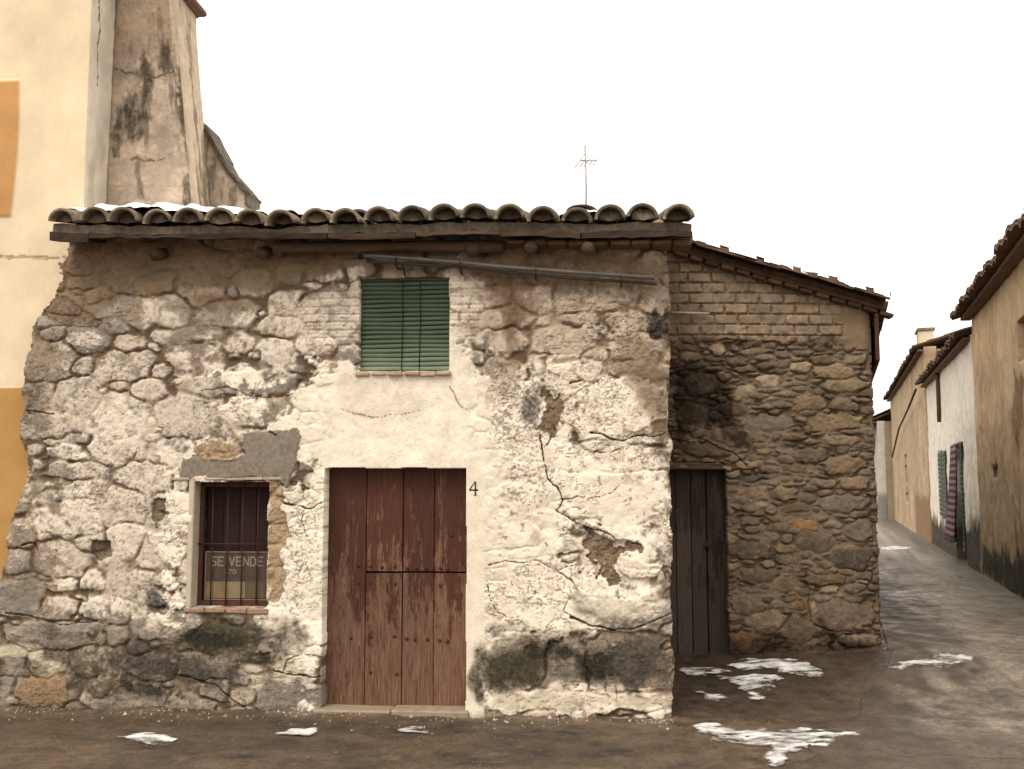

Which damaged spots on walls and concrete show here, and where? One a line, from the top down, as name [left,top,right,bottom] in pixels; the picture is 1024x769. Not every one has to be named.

water stain [113,45,170,156]
spalling [42,295,112,328]
peeling [194,440,240,461]
spalling [520,389,565,439]
crack [539,425,618,523]
crack [590,432,668,453]
peeling [267,480,302,602]
spalling [582,523,662,586]
crack [487,560,672,631]
flaking render [14,672,69,707]
water stain [470,646,485,700]
water stain [524,637,641,700]